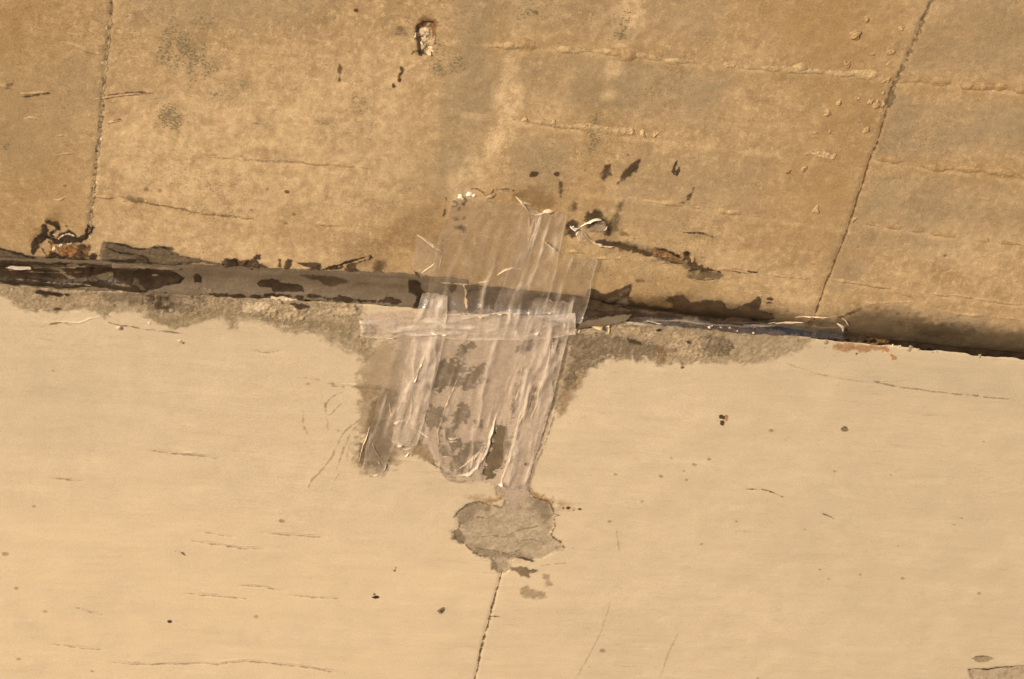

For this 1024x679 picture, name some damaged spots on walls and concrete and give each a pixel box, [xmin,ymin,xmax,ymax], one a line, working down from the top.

spalling [411,18,436,56]
crack [87,0,113,237]
crack [809,0,934,327]
peeling [0,249,33,259]
rust [49,244,89,259]
peeling [99,241,222,266]
water stain [586,279,775,321]
spalling [452,483,581,573]
crack [474,571,503,679]